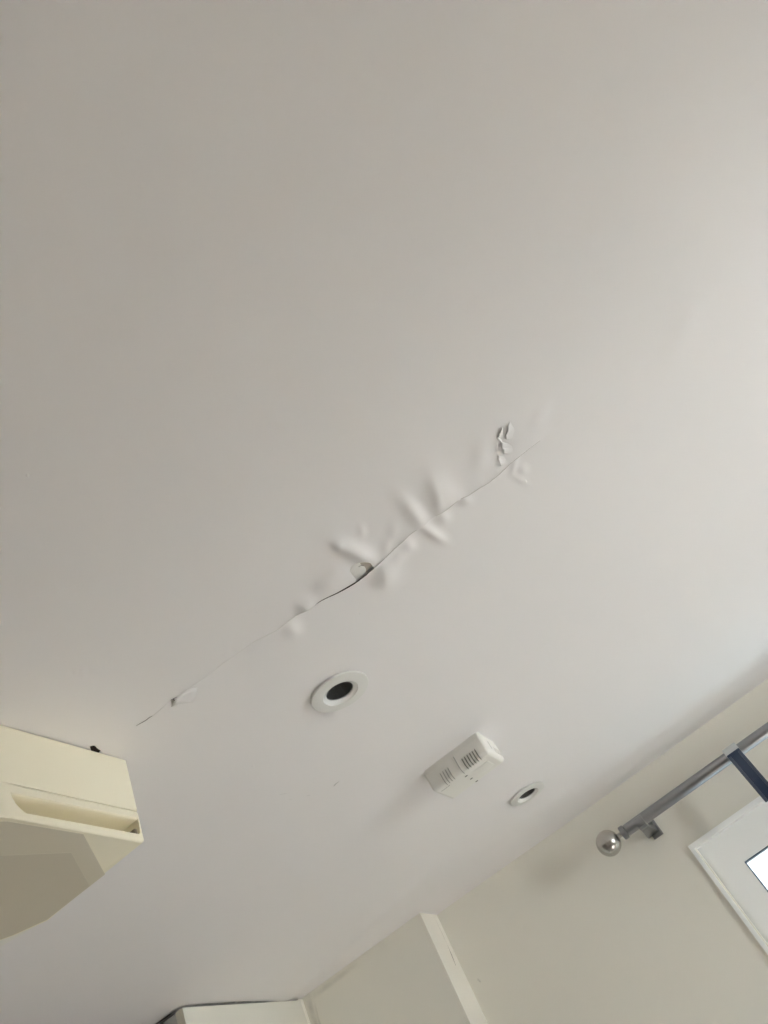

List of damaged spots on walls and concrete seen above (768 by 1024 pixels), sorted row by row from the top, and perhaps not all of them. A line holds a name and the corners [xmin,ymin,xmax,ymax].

peeling [497,422,514,466]
crack [138,531,415,725]